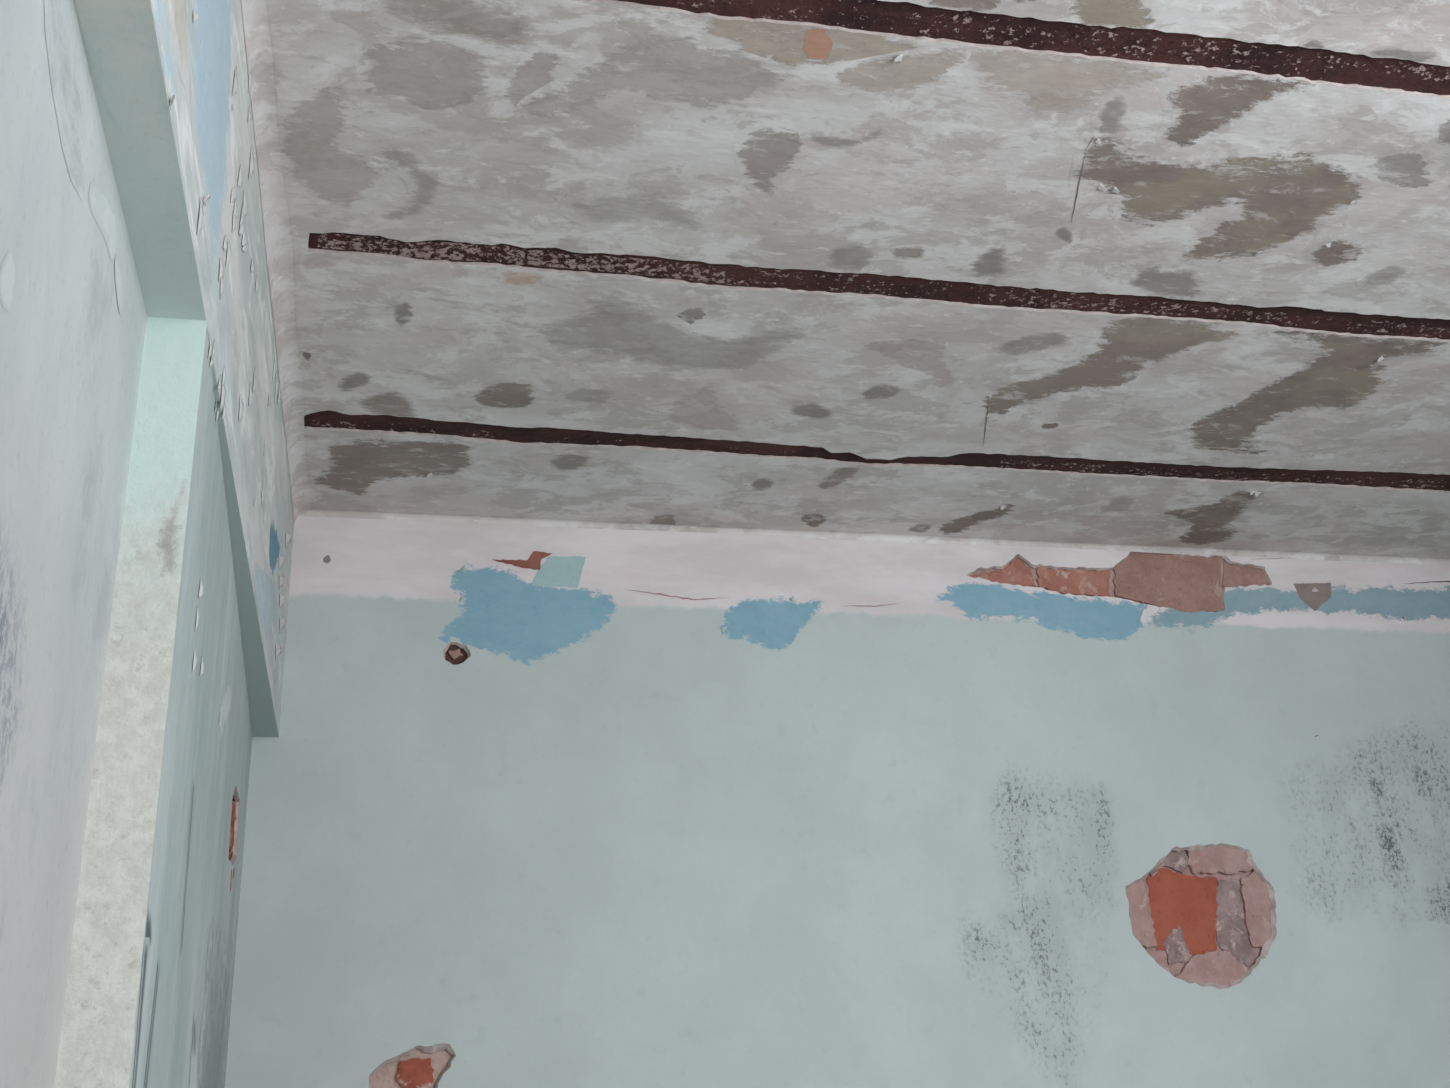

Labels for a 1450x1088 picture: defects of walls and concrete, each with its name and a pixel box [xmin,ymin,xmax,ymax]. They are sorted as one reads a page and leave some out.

rust [494,268,554,289]
peeling [432,551,622,670]
peeling [713,592,827,658]
peeling [926,487,1450,647]
flaking render [228,786,239,891]
water stain [1266,696,1450,946]
water stain [940,753,1132,1088]
flaking render [1125,843,1277,989]
flaking render [369,1043,456,1088]